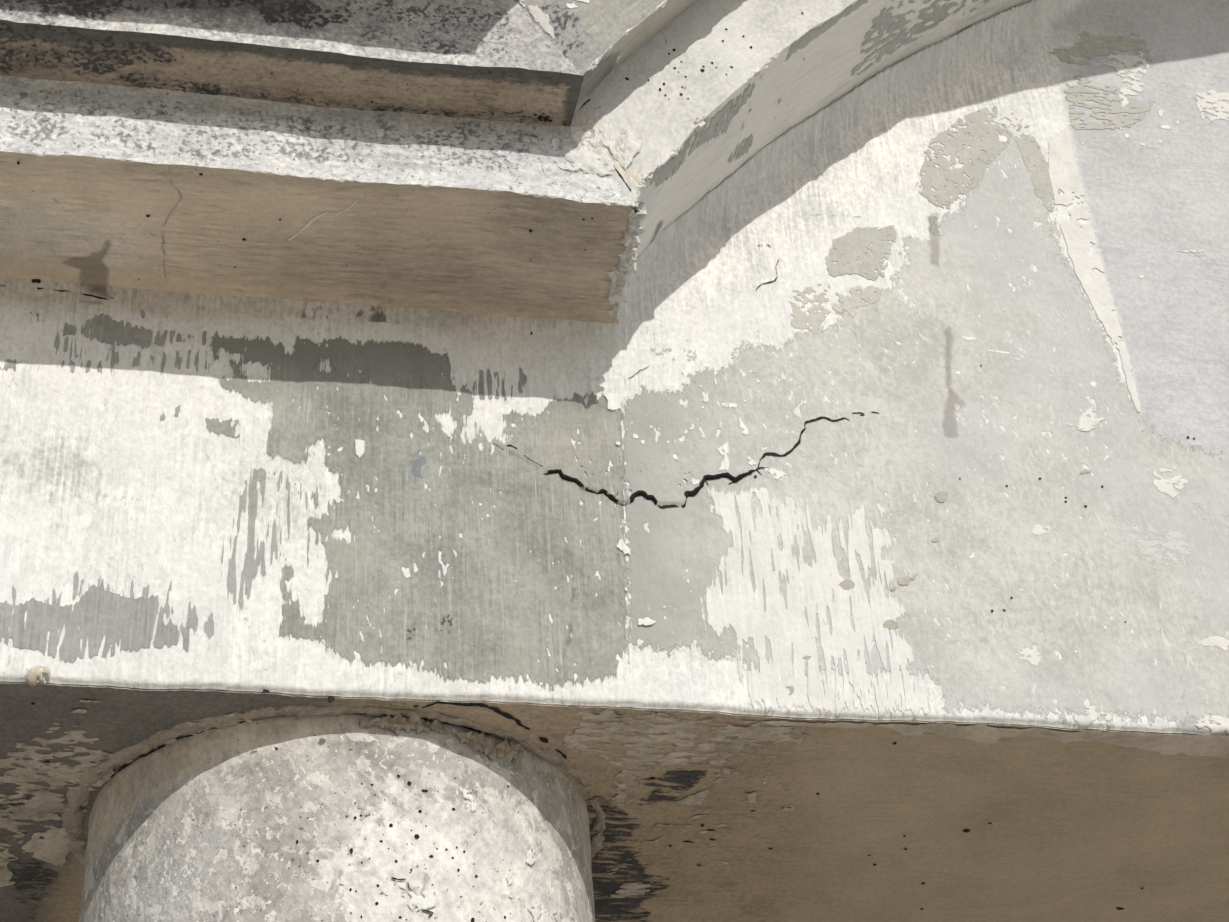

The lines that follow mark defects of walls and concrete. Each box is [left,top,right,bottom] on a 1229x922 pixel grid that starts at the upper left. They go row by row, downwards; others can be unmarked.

spalling [583,0,668,74]
peeling [851,0,990,76]
peeling [1048,32,1155,130]
spalling [605,0,868,319]
peeling [61,106,1229,728]
crack [493,412,878,508]
peeling [0,584,194,686]
damp [10,860,57,919]